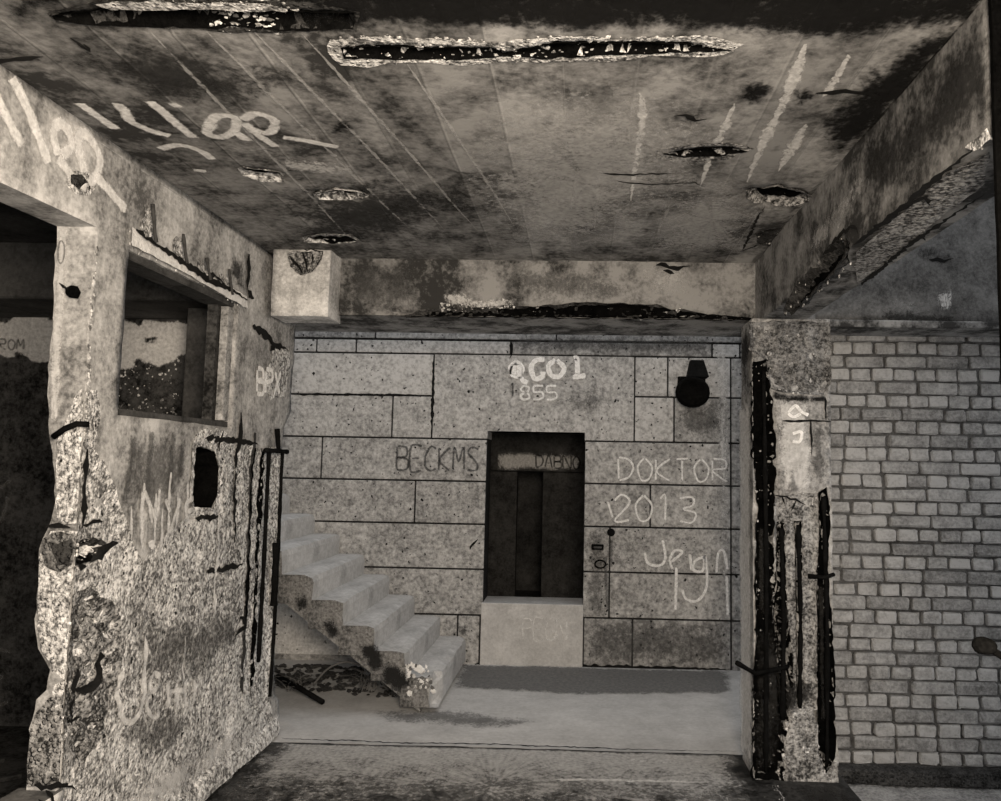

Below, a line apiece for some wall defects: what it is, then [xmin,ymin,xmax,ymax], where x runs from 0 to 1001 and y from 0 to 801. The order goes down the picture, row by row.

spalling [47,0,744,68]
peeling [0,230,281,801]
spalling [264,348,290,400]
spalling [401,128,992,783]